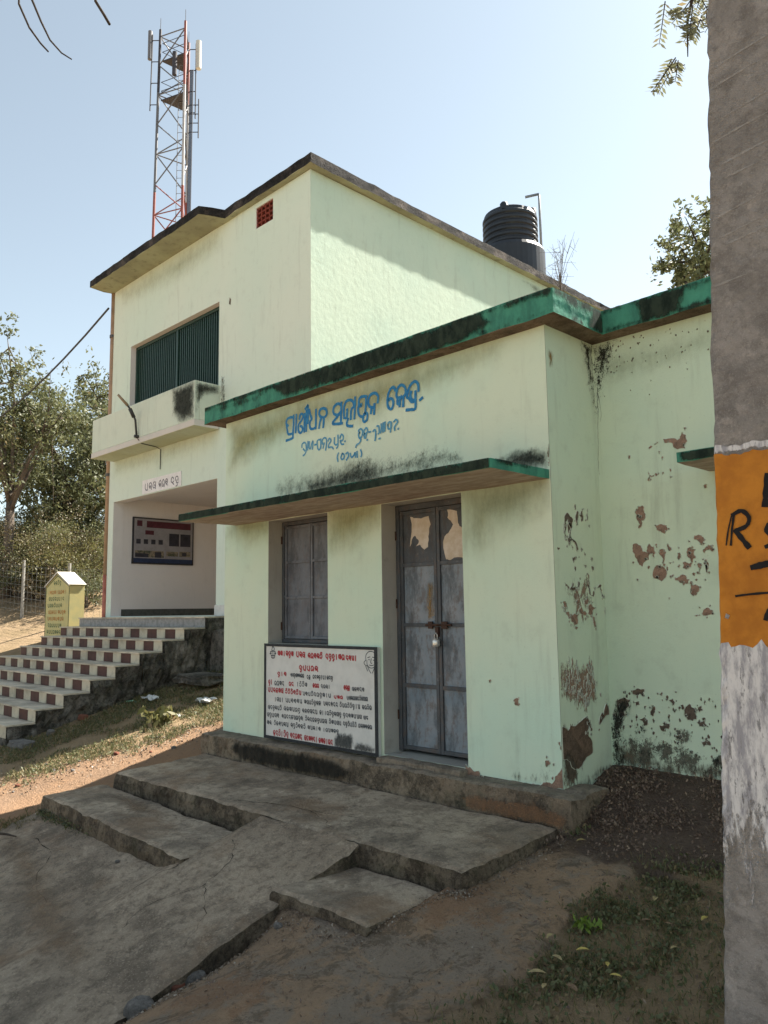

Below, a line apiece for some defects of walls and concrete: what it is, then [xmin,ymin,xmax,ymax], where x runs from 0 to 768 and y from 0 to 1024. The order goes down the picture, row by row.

water stain [173,309,491,420]
water stain [504,278,711,409]
water stain [178,451,544,521]
peeling [648,427,687,481]
peeling [557,504,606,630]
peeling [632,505,730,619]
spalling [532,656,722,789]
water stain [611,698,722,777]